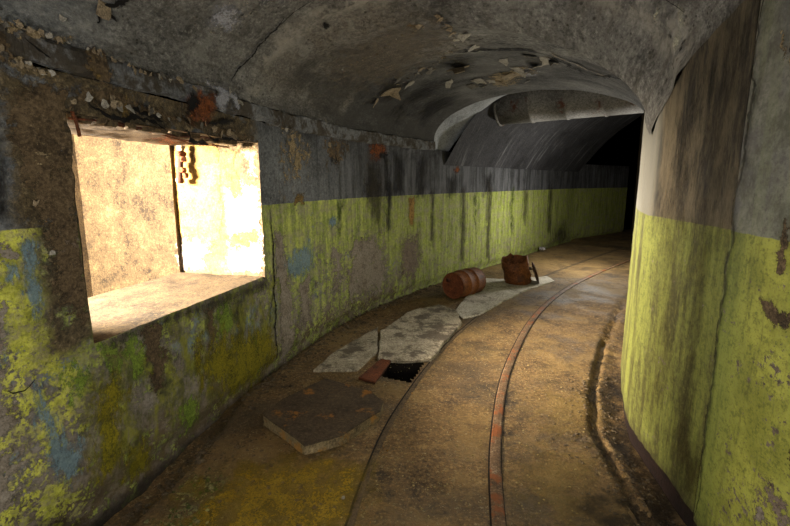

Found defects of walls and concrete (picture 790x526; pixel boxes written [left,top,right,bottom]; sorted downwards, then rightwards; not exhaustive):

crack [96,0,129,23]
rust [187,85,235,127]
peeling [373,33,559,107]
spalling [0,17,265,326]
leakage [367,151,405,231]
leakage [408,159,434,240]
leakage [448,176,477,257]
leakage [484,173,492,257]
leakage [140,281,267,393]
peeling [0,300,34,517]
peeling [32,382,87,484]
peeling [751,449,790,526]